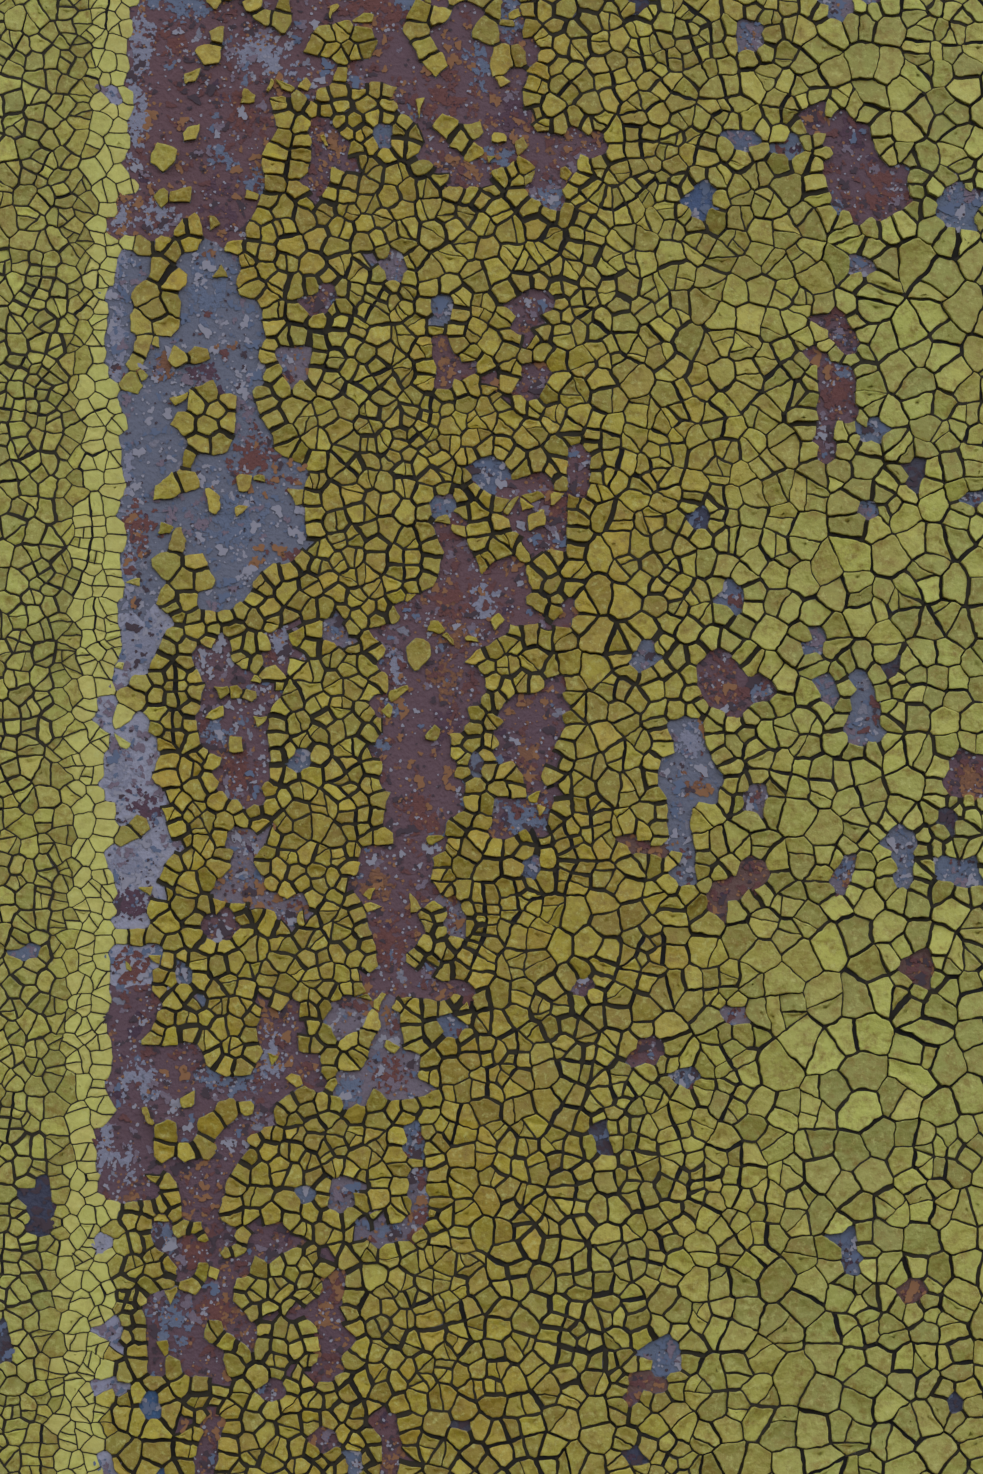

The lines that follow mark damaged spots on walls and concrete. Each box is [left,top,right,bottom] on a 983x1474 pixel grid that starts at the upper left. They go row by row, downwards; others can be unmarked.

peeling [720,101,913,225]
corrosion [801,102,909,225]
crack [831,0,983,285]
crack [128,218,204,372]
crack [173,387,236,494]
corrosion [807,314,881,461]
peeling [90,0,641,1419]
crack [450,662,509,768]
corrosion [707,855,768,918]
peeling [615,648,983,1193]
corrosion [19,1177,57,1234]
peeling [307,1426,361,1474]